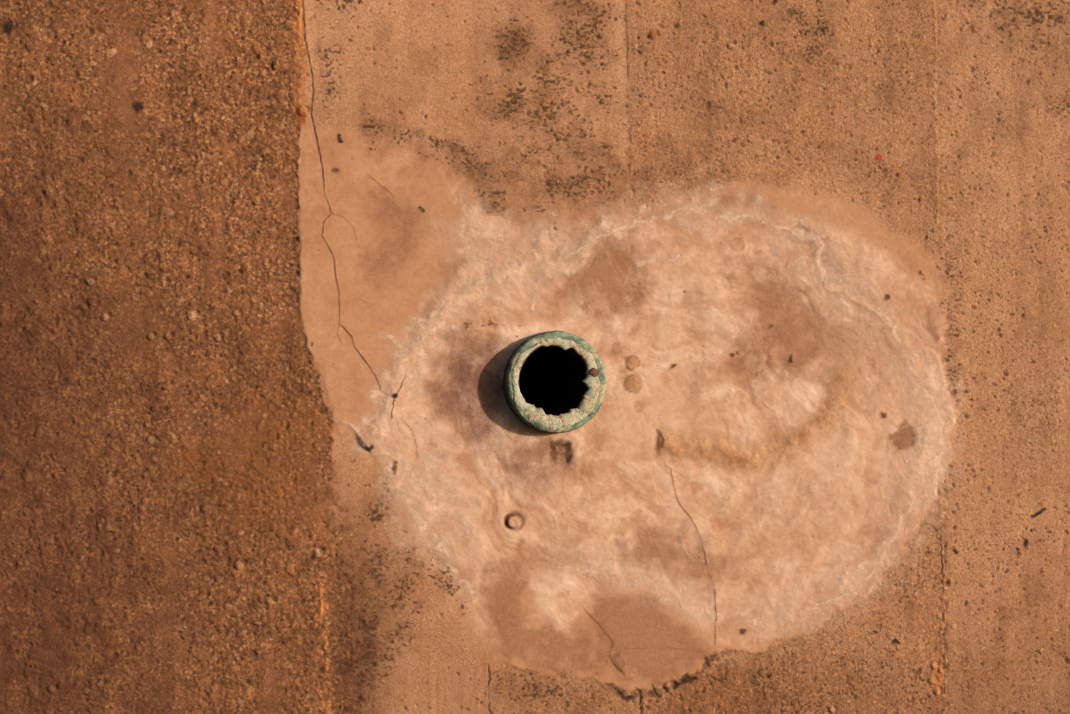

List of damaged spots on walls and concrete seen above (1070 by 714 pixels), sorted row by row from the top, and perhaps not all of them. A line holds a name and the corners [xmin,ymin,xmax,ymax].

crack [303,0,418,453]
damp [346,0,964,707]
crack [587,468,717,714]